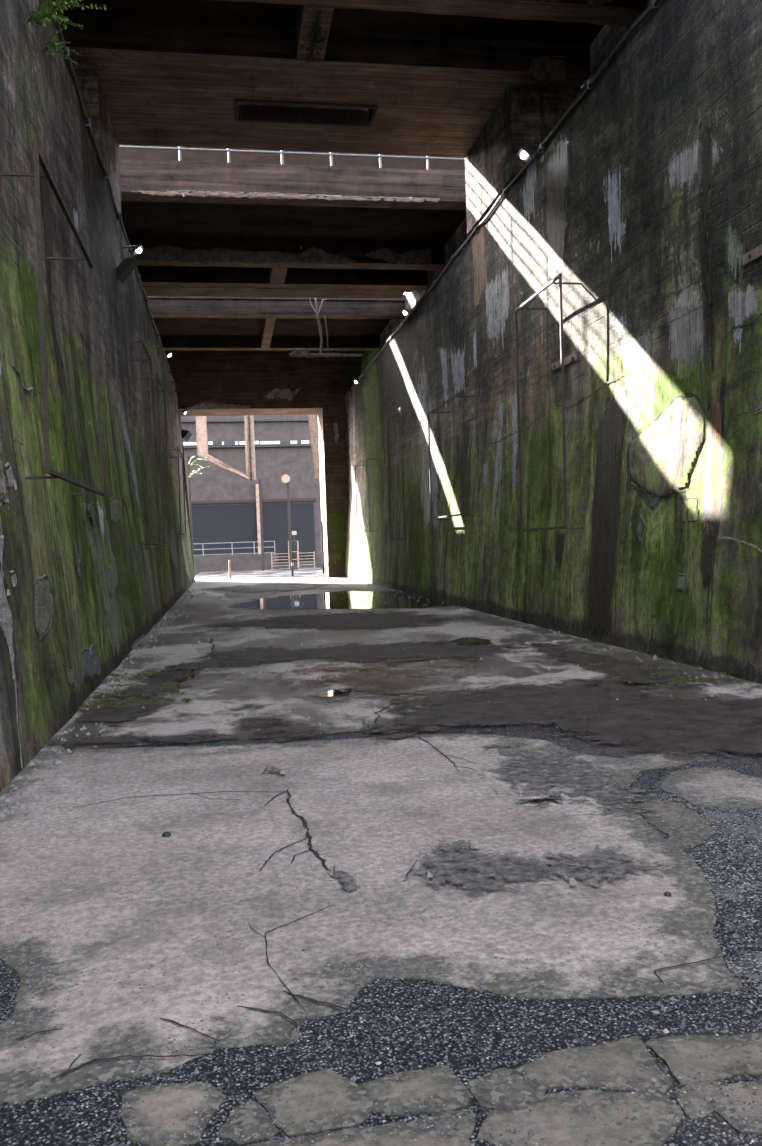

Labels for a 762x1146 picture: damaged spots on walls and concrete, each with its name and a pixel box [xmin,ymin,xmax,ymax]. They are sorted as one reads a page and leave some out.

damp [597,166,626,262]
damp [31,158,72,435]
damp [441,217,509,432]
damp [677,123,726,636]
damp [112,392,142,511]
damp [425,456,439,510]
damp [483,392,518,522]
damp [587,310,651,637]
spalling [0,434,17,683]
crack [72,788,339,878]
spalling [403,840,669,895]
crack [237,905,349,1033]